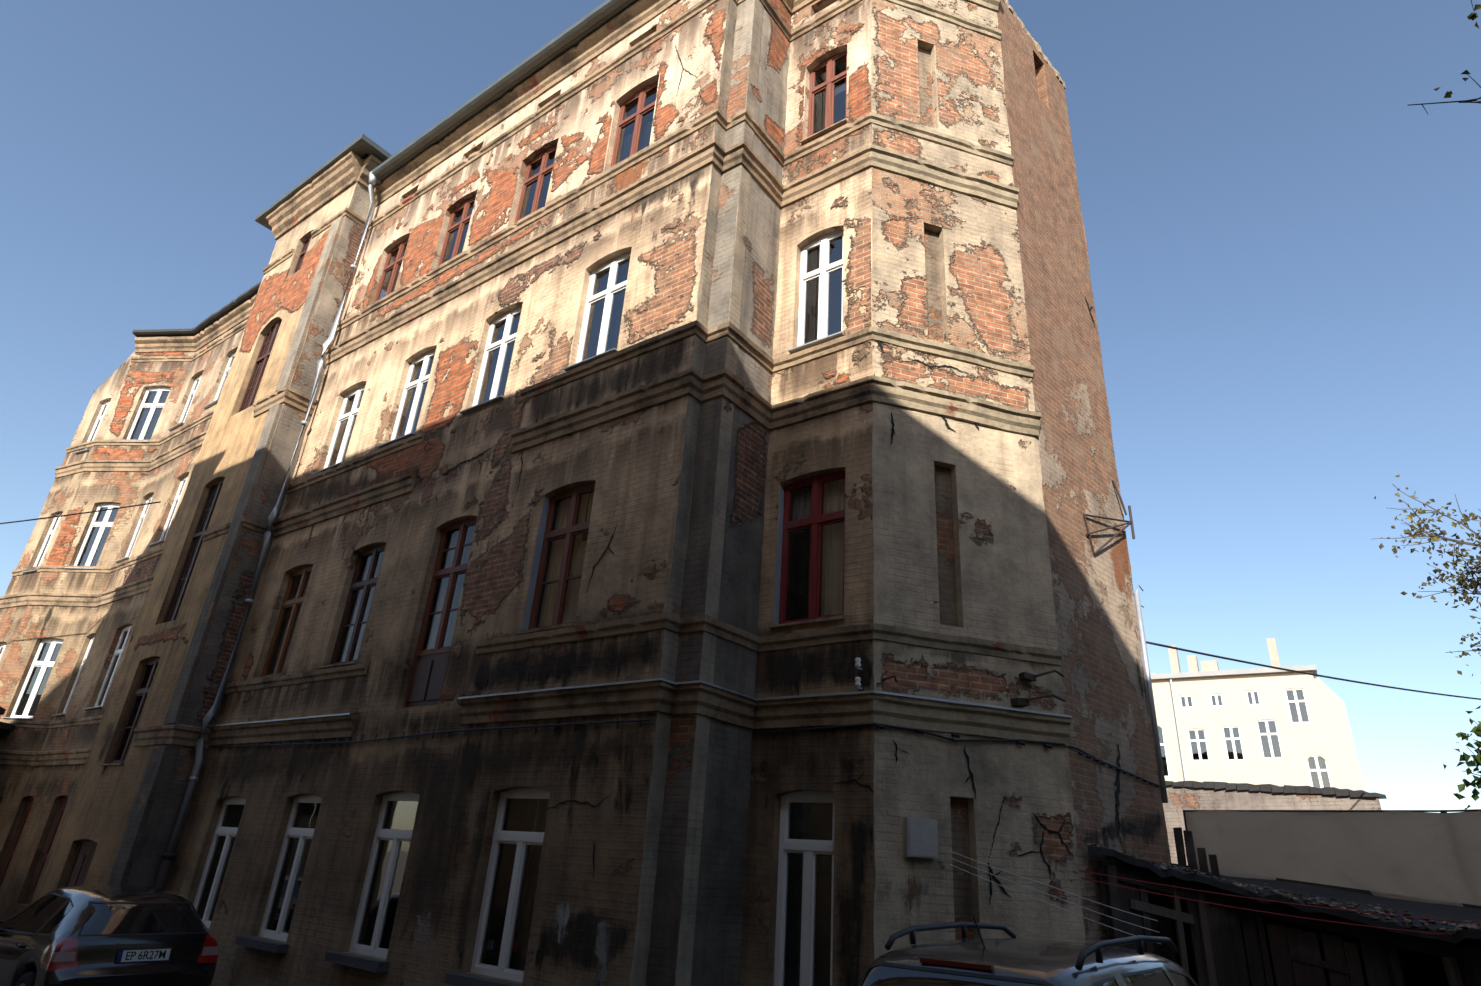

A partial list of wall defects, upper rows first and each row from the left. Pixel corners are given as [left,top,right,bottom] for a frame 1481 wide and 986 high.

flaking render [653,46,684,158]
flaking render [699,3,726,106]
flaking render [750,0,1009,160]
flaking render [233,100,615,368]
flaking render [623,217,698,345]
flaking render [809,176,1030,410]
flaking render [334,338,479,497]
flaking render [459,323,574,636]
crack [586,523,618,593]
water stain [474,638,656,695]
flaking render [876,652,1057,711]
water stain [536,901,627,986]